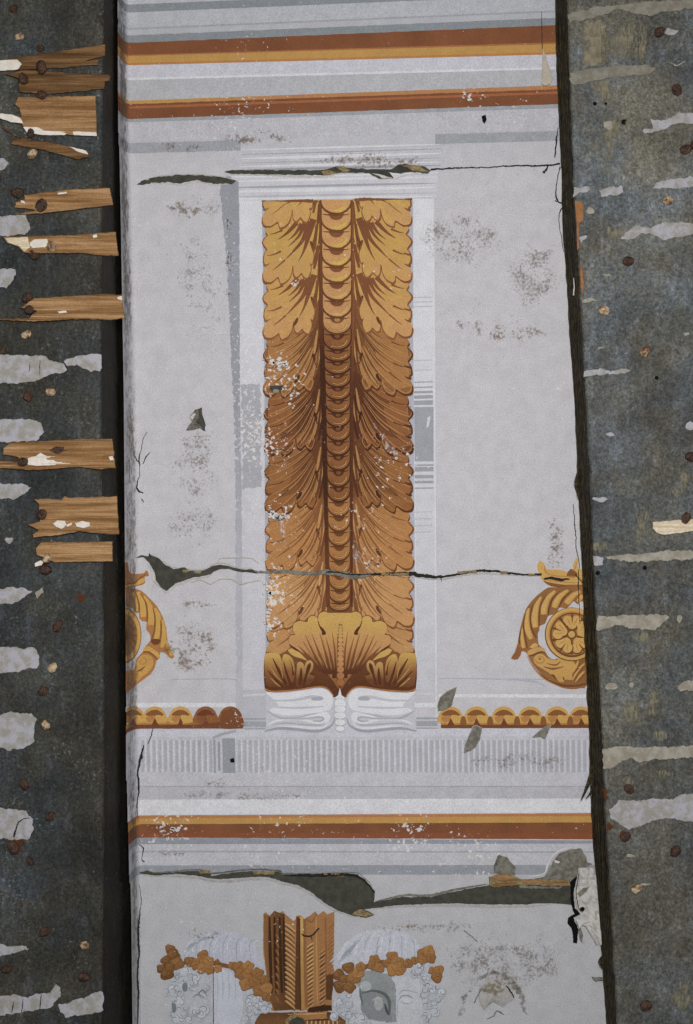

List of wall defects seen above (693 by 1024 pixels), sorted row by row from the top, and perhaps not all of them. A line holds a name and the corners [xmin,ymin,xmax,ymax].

spalling [186,407,206,430]
crack [135,432,148,502]
crack [136,505,582,621]
spalling [438,687,457,711]
spalling [464,725,482,753]
spalling [533,724,551,739]
crack [136,729,153,816]
spalling [494,855,516,875]
spalling [530,847,591,880]